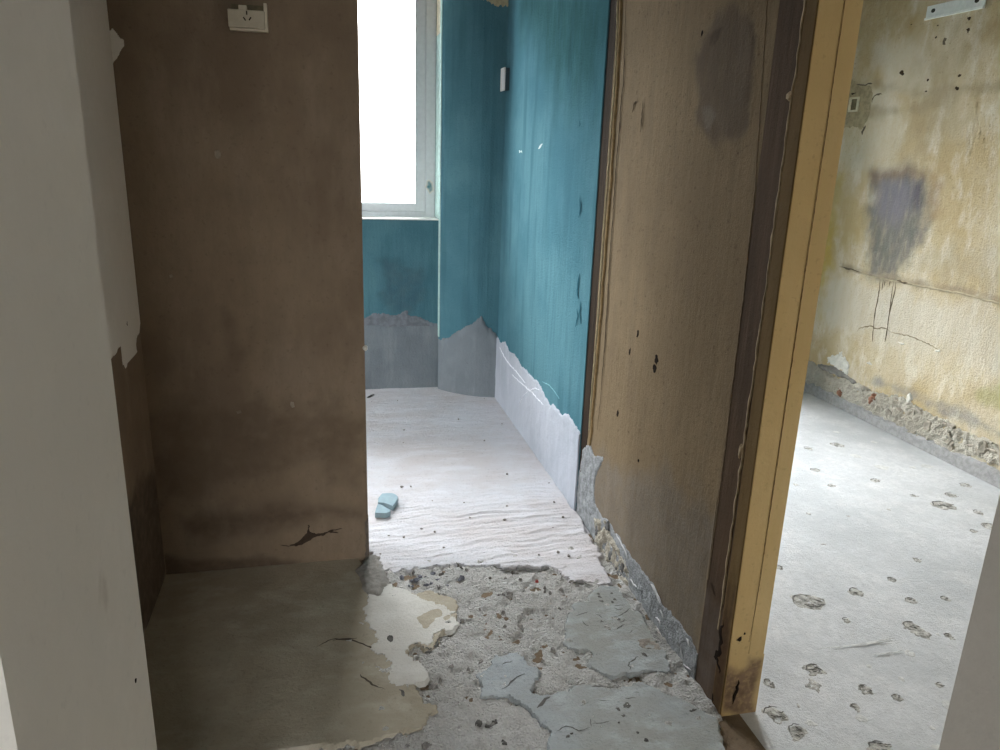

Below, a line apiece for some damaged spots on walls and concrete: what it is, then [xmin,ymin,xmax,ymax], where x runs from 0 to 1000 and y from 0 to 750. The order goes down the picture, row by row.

water stain [691,0,760,153]
water stain [861,167,936,341]
crack [858,325,940,350]
spalling [805,351,1000,466]
spalling [319,518,723,750]